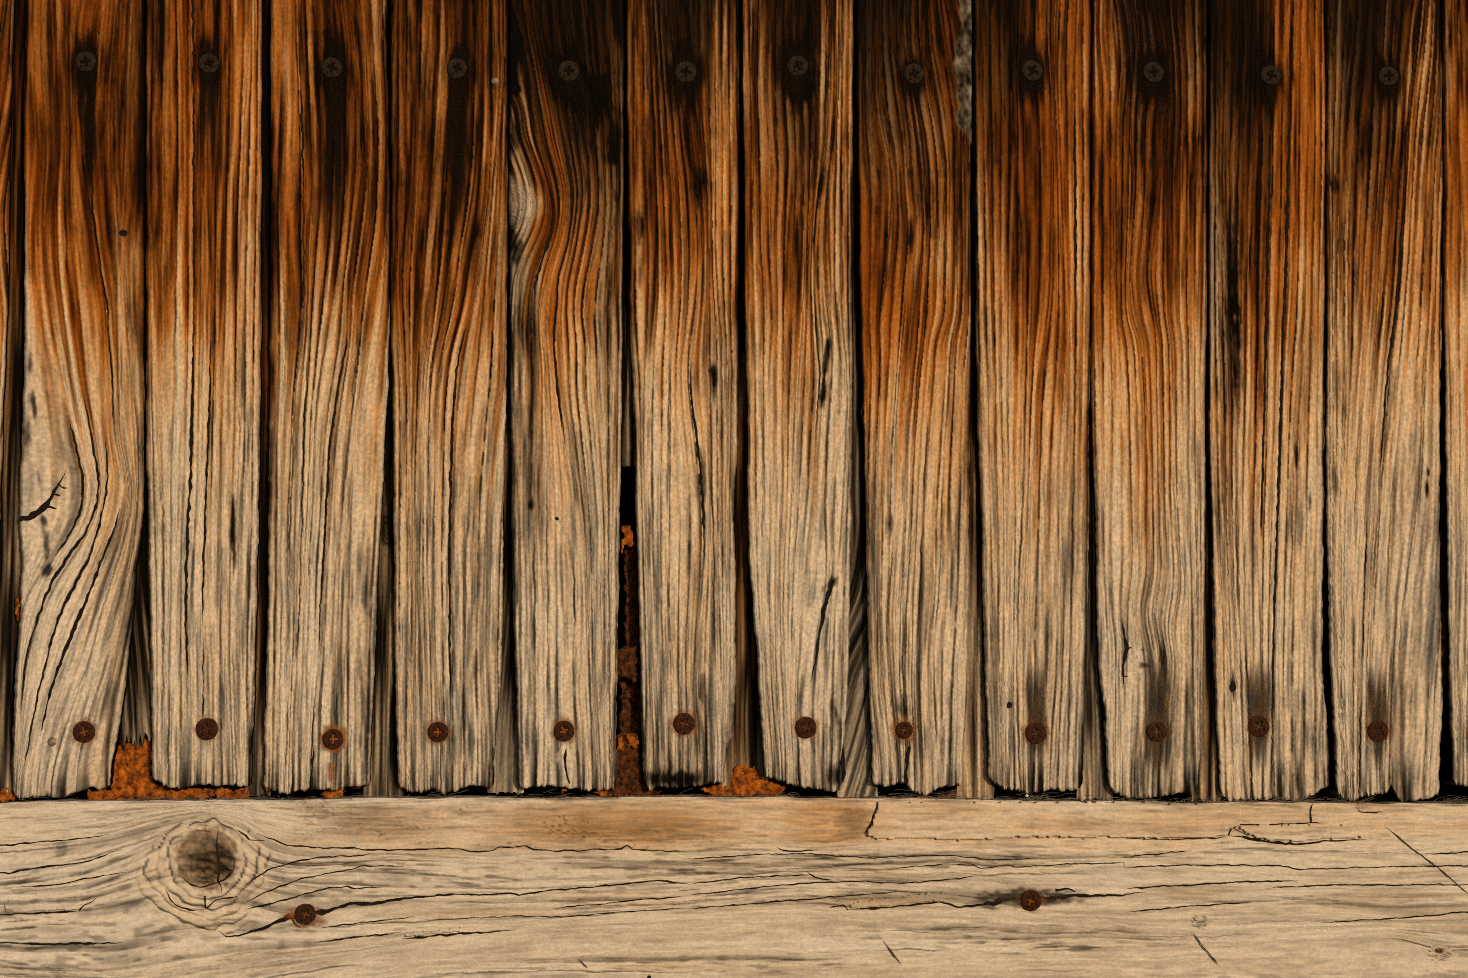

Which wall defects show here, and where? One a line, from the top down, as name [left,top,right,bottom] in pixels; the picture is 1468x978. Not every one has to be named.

crack [20,401,120,762]
corrosion [594,525,662,796]
corrosion [87,739,272,800]
corrosion [319,725,363,798]
corrosion [700,765,786,796]
crack [0,834,126,945]
crack [165,743,1468,942]